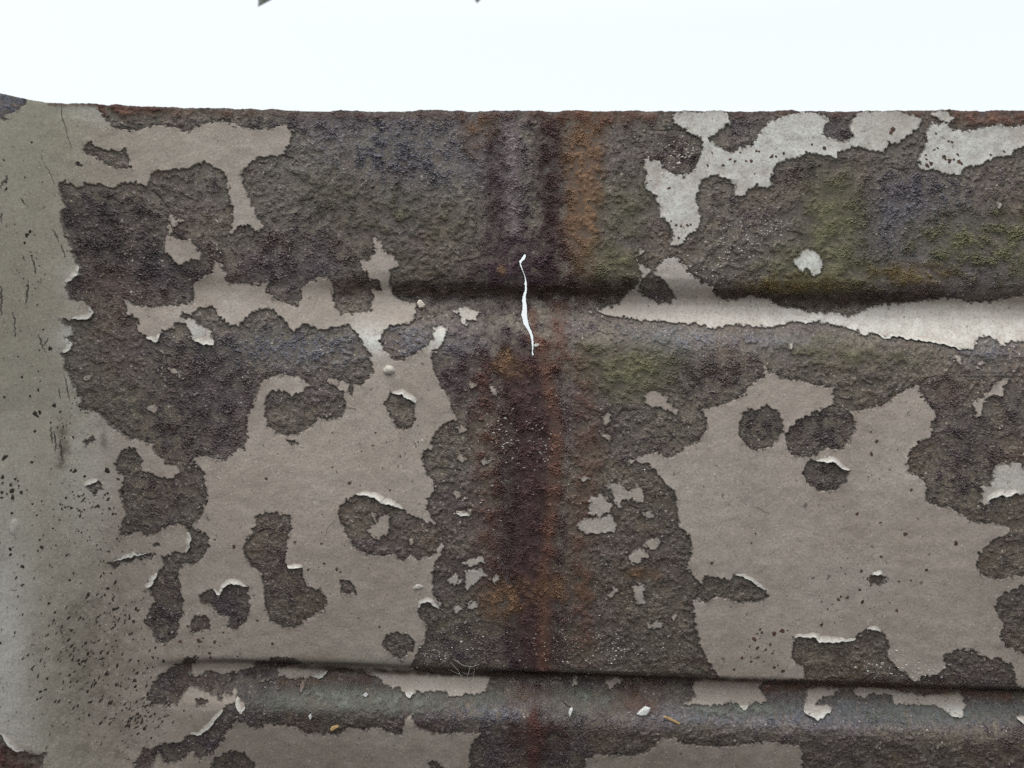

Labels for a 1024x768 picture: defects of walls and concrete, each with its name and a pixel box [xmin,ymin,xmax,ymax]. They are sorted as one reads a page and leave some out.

peeling [0,93,26,119]
crack [513,248,535,357]
peeling [59,105,1024,643]
corrosion [472,110,655,306]
corrosion [954,111,1024,124]
corrosion [487,314,585,673]
peeling [137,290,1024,768]
peeling [0,732,46,768]